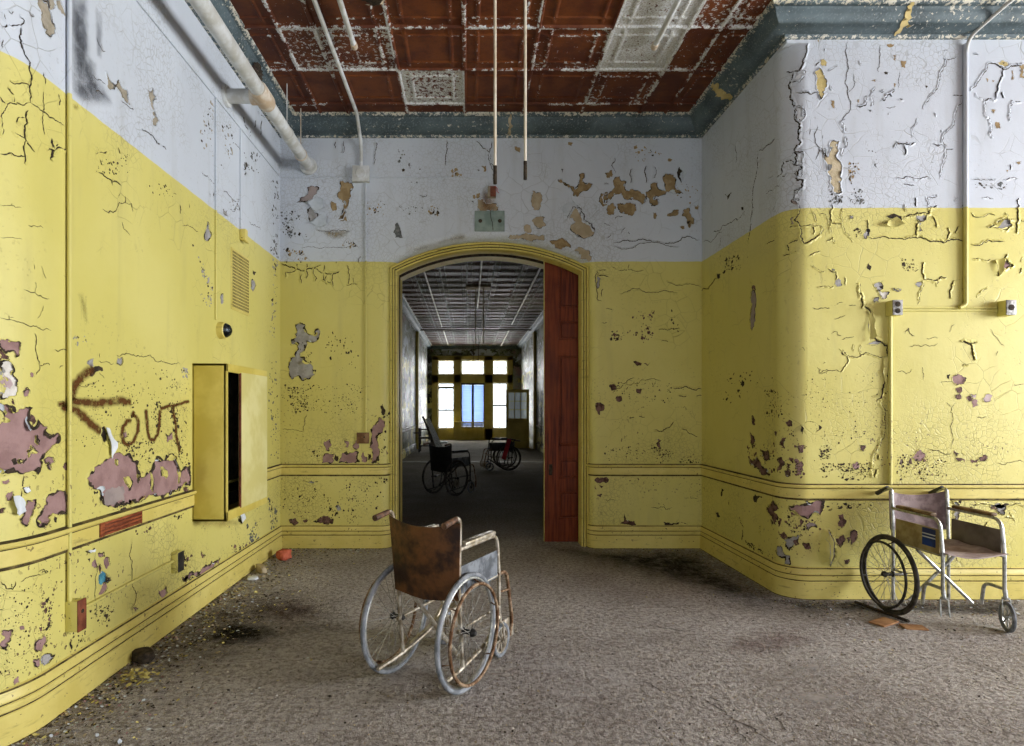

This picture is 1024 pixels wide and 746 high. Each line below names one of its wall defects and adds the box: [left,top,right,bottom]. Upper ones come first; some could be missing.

crack [0,8,67,166]
spalling [252,62,264,81]
peeling [711,83,733,100]
peeling [270,180,355,336]
peeling [508,145,699,262]
crack [567,41,1024,478]
peeling [822,139,870,239]
peeling [0,338,67,530]
peeling [76,358,192,511]
peeling [268,322,362,456]
peeling [309,404,390,464]
peeling [753,495,872,566]